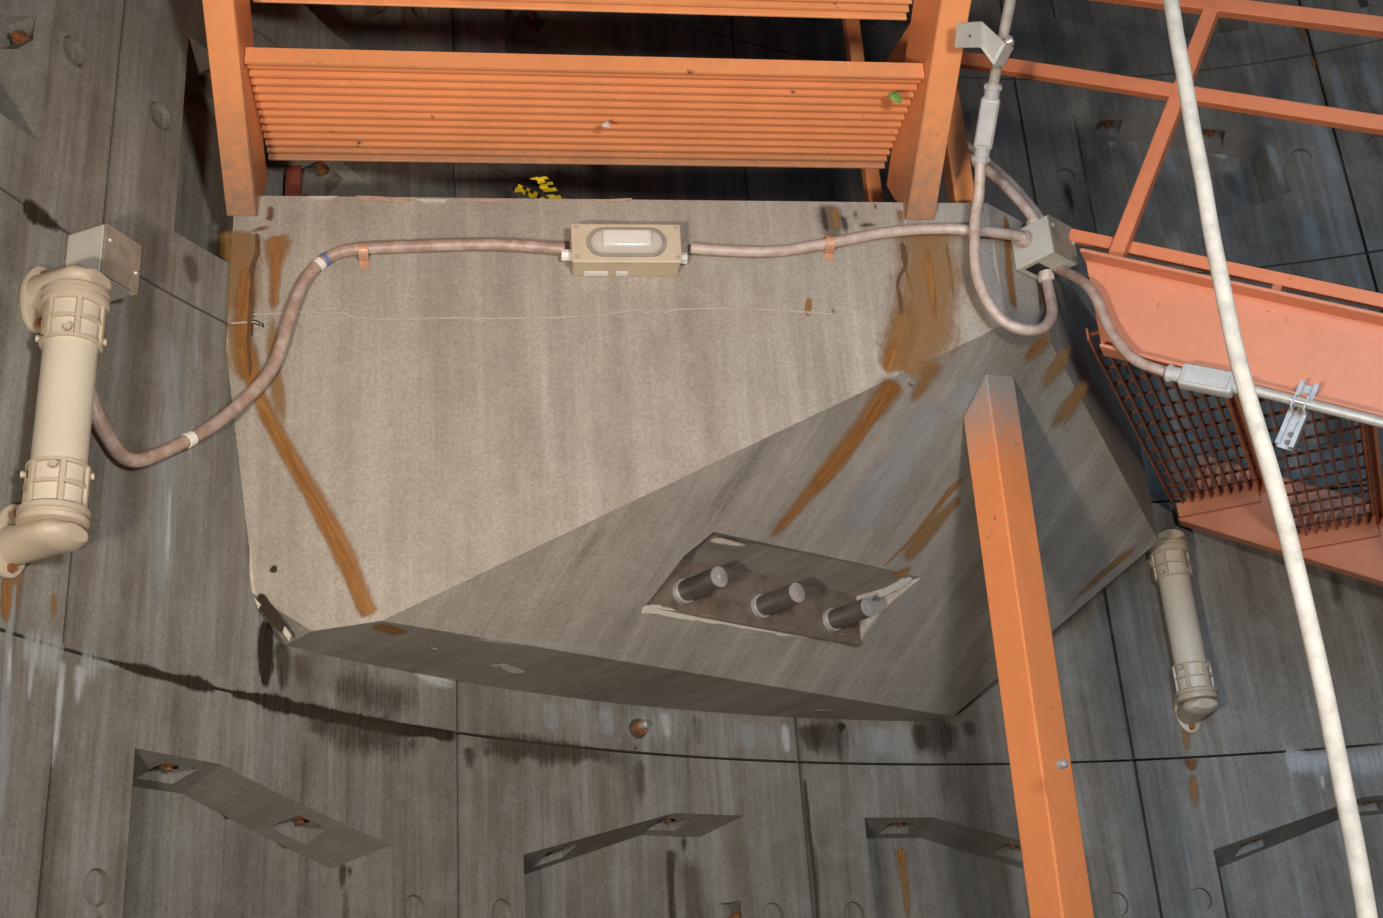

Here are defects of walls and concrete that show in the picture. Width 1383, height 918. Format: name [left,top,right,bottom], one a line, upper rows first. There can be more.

rust [222,207,404,634]
rust [773,211,962,534]
rust [895,848,910,914]
rust [1183,730,1198,802]